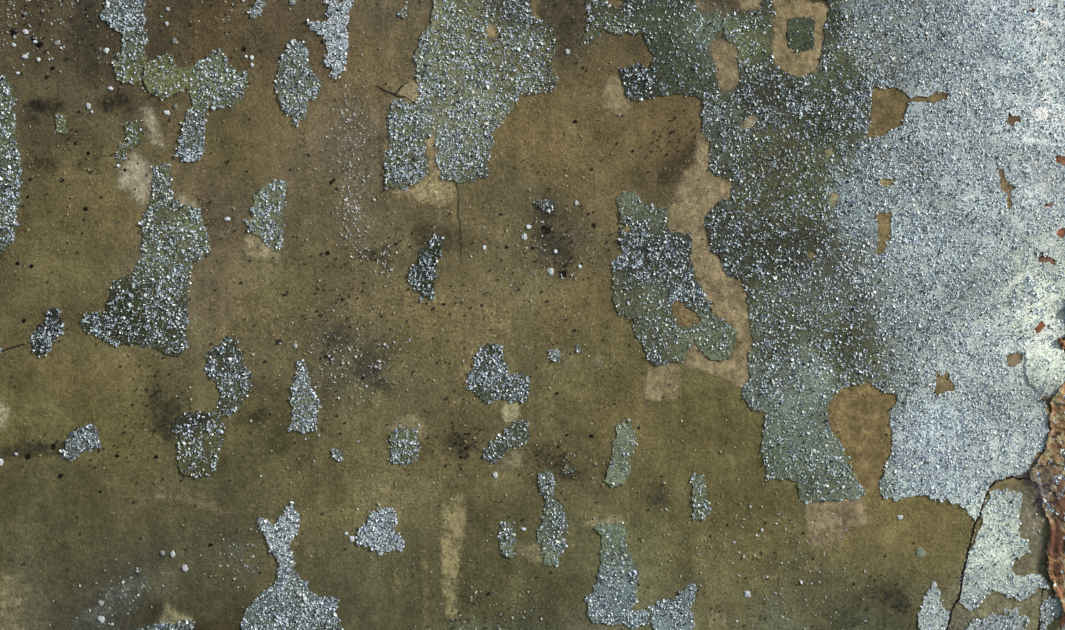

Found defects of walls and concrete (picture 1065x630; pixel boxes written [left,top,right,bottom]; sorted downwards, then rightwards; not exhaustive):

peeling [0,73,24,253]
peeling [80,0,250,356]
peeling [383,0,559,208]
peeling [29,308,64,357]
peeling [580,0,1065,630]
peeling [59,424,103,462]
peeling [172,336,253,478]
peeling [136,603,195,630]
peeling [241,502,343,630]
peeling [498,466,577,567]
crack [946,476,1040,630]
corrosion [1050,484,1065,597]